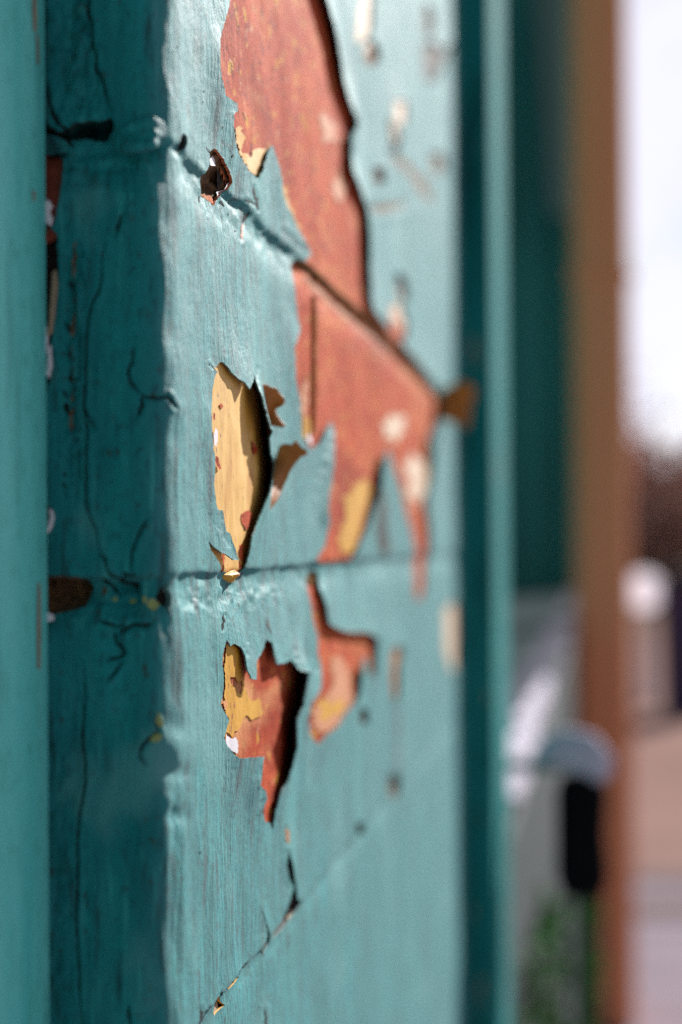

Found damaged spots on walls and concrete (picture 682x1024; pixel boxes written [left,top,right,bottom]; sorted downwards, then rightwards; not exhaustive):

crack [83,214,147,594]
crack [126,345,176,417]
peeling [199,0,476,829]
crack [200,828,302,1024]